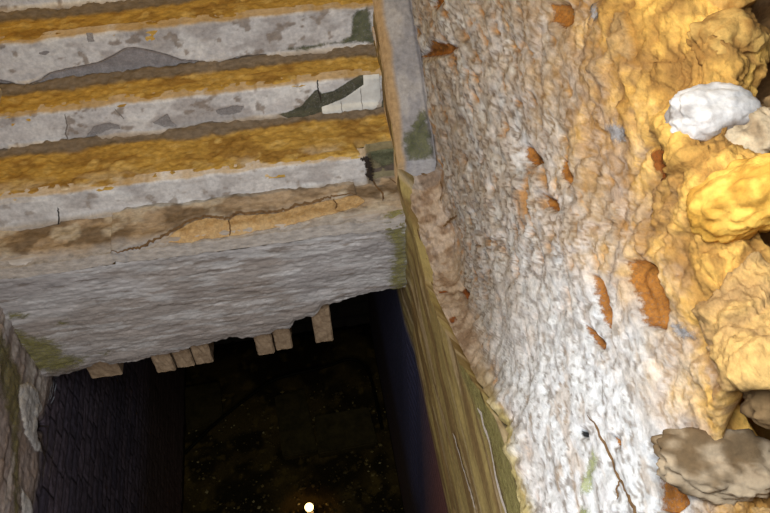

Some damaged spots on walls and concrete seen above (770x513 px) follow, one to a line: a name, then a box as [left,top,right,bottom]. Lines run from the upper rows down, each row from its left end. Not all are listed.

spalling [0,47,197,86]
crack [360,156,396,200]
crack [110,193,356,253]